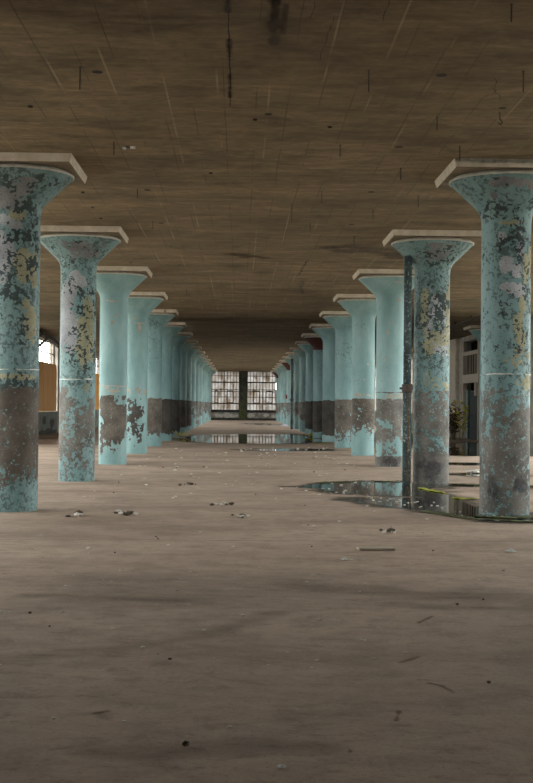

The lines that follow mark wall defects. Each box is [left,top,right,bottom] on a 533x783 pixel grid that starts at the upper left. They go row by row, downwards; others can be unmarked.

peeling [0,172,404,495]
peeling [413,245,457,484]
peeling [478,196,533,516]